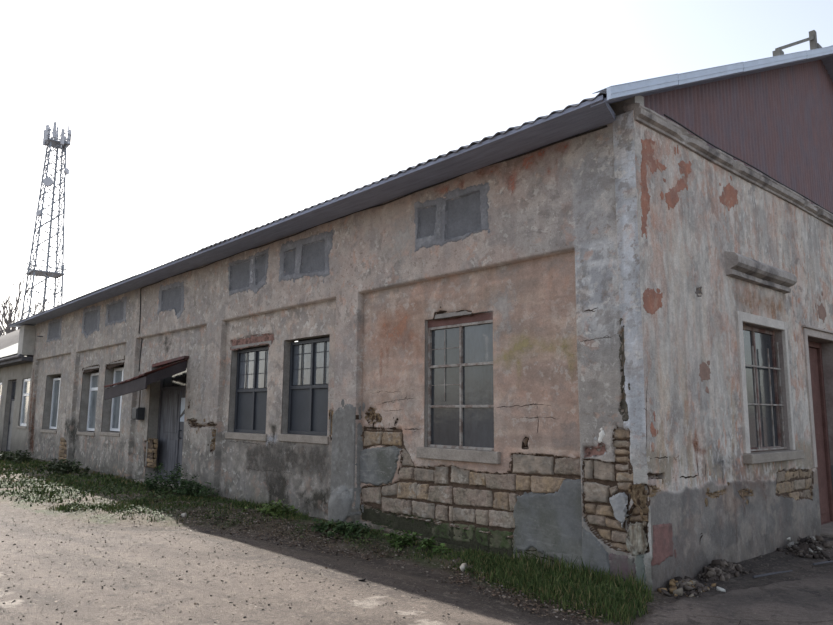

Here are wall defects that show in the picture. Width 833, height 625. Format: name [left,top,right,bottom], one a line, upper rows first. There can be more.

peeling [640,138,692,239]
peeling [719,175,738,211]
peeling [643,288,663,315]
spalling [187,400,217,454]
crack [369,389,418,432]
flaking render [356,318,664,558]
crack [497,404,555,433]
leakage [247,431,325,504]
leakage [300,492,328,509]
flaking render [775,468,814,501]